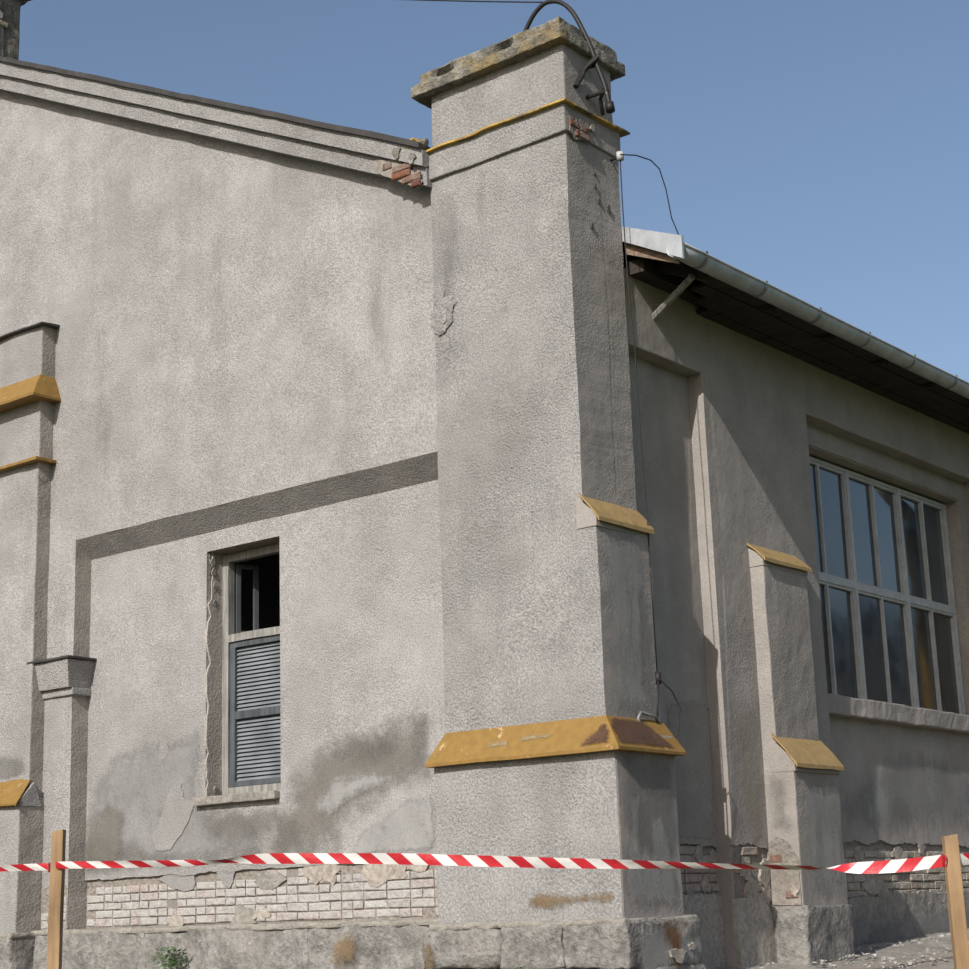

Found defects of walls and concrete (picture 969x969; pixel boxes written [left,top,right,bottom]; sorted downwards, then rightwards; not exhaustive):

spalling [569,118,595,143]
spalling [373,138,429,188]
rust [583,718,672,747]
peeling [667,701,719,895]
damp [89,807,123,861]
damp [625,757,674,904]
spalling [87,864,438,929]
spalling [732,836,802,906]
spalling [843,844,947,898]
spalling [959,847,969,893]
rust [664,923,687,968]